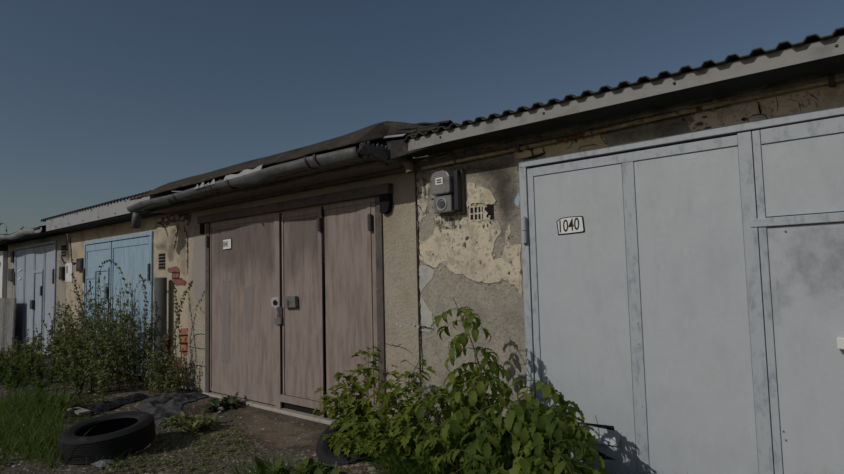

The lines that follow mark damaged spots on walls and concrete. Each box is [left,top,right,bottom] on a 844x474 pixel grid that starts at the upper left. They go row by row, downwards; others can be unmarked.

flaking render [682,81,844,131]
water stain [472,165,512,212]
crack [156,222,188,274]
flaking render [167,266,186,285]
flaking render [416,174,523,332]